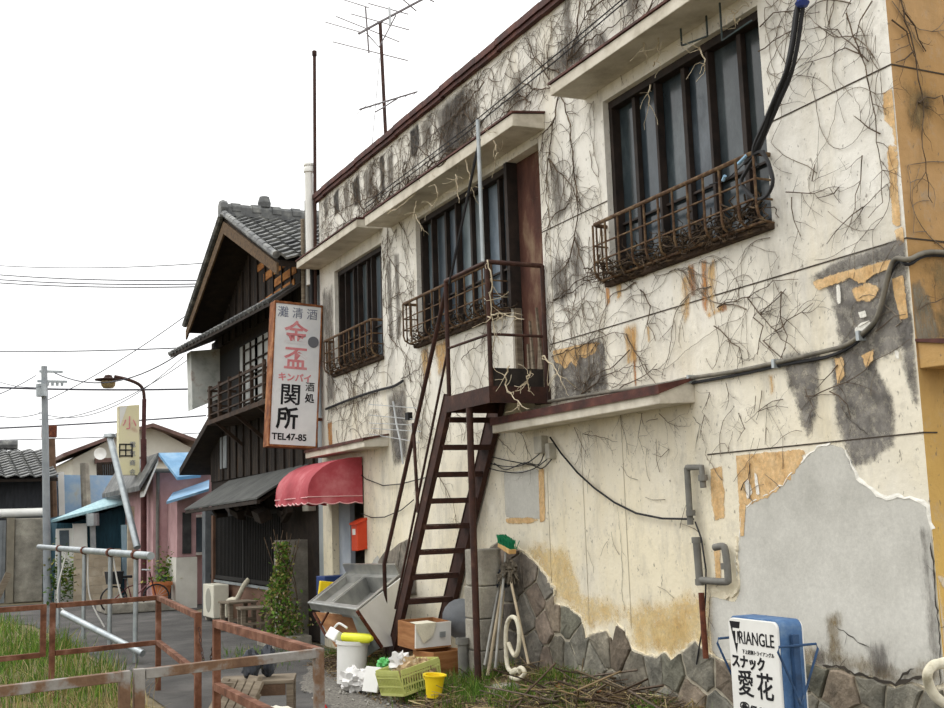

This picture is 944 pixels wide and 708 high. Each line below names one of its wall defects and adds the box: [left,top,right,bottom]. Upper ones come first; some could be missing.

peeling [883,89,904,242]
rust [682,261,727,319]
peeling [813,260,908,331]
leakage [786,353,819,431]
peeling [835,357,844,384]
peeling [861,350,874,367]
leakage [814,238,944,465]
leakage [532,548,709,654]
peeling [554,443,944,686]